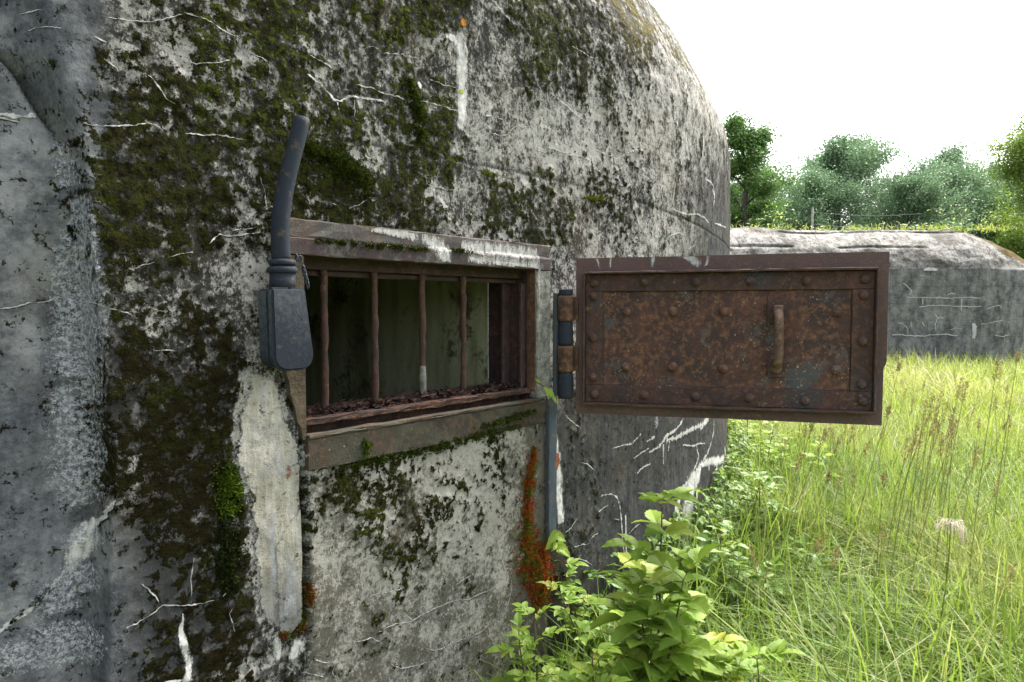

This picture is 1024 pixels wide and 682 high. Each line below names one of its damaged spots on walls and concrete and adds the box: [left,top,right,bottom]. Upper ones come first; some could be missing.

crack [94,13,268,70]
crack [308,46,457,116]
water stain [439,31,468,130]
crack [85,121,160,129]
crack [185,132,243,140]
water stain [371,228,541,299]
crack [893,283,1008,340]
rust [306,379,524,416]
crack [615,418,714,487]
crack [565,493,639,565]
crack [127,558,235,631]
water stain [269,514,297,619]